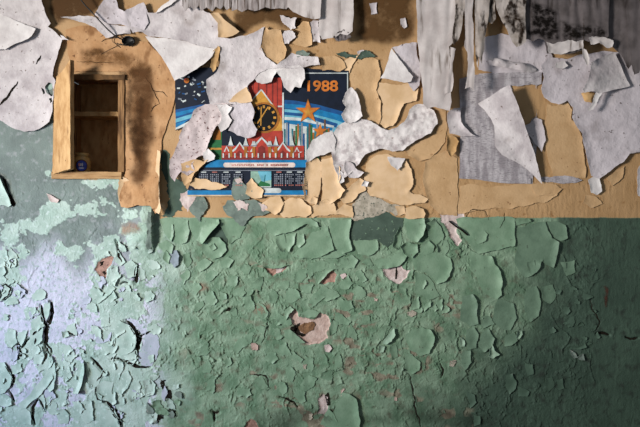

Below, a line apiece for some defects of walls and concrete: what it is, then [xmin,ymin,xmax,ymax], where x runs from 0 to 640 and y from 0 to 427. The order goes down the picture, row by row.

peeling [260,21,312,65]
water stain [85,50,153,182]
peeling [320,54,418,129]
crack [116,240,139,284]
peeling [0,102,586,427]
crack [5,302,54,401]
crack [31,398,45,425]
crack [92,320,151,425]
crack [409,375,421,426]
crack [590,301,609,335]